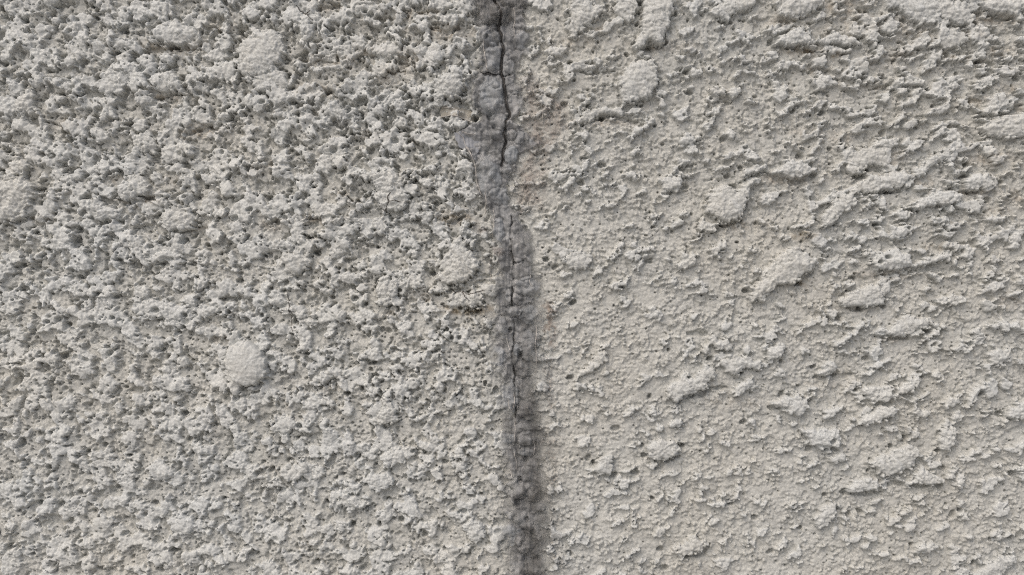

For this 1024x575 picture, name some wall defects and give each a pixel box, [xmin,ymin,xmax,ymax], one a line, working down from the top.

crack [481,0,522,165]